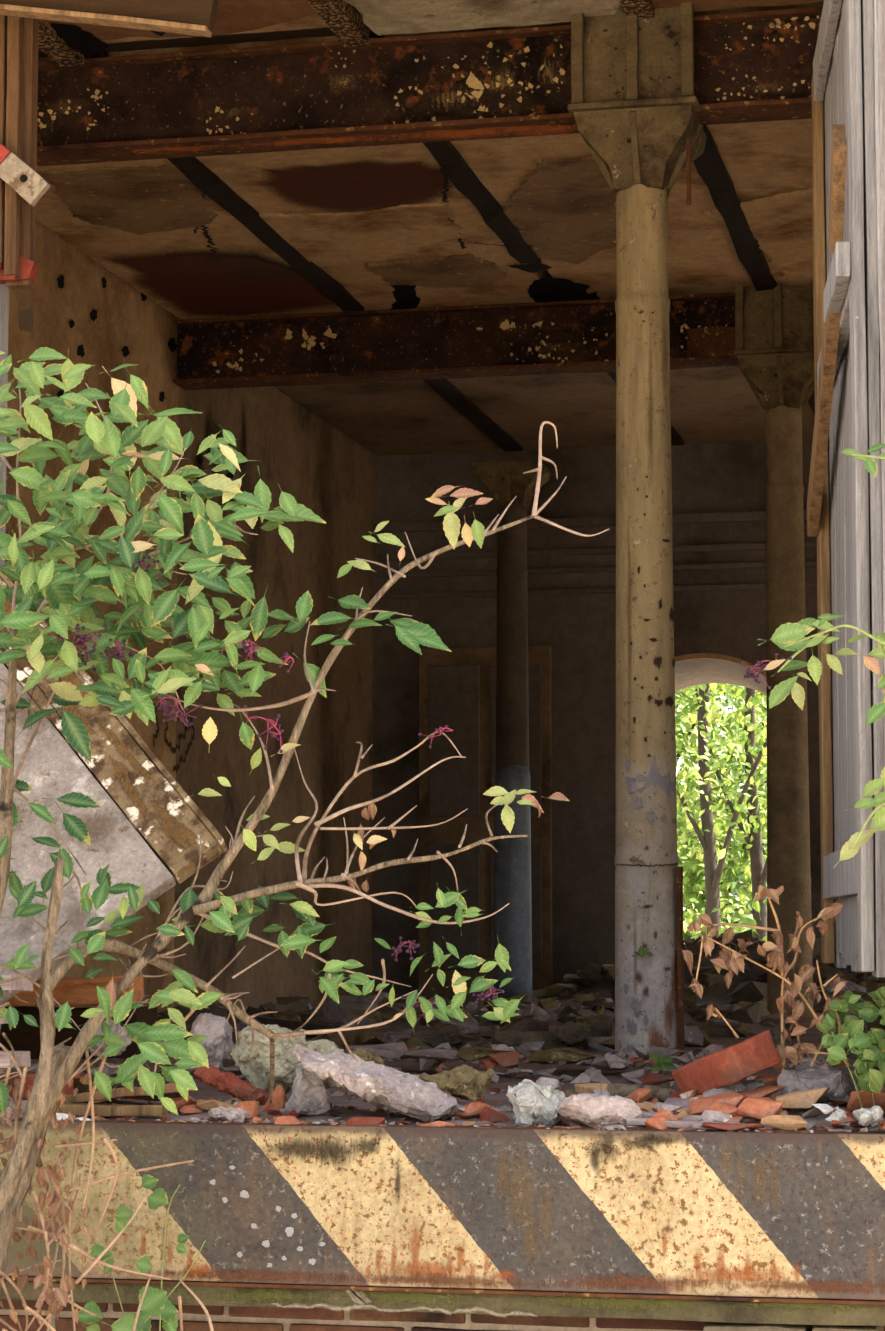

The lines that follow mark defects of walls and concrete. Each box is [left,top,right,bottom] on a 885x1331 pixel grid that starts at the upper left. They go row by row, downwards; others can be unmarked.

rust [165,1248,343,1282]
rust [359,1234,521,1287]
rust [566,1255,885,1293]